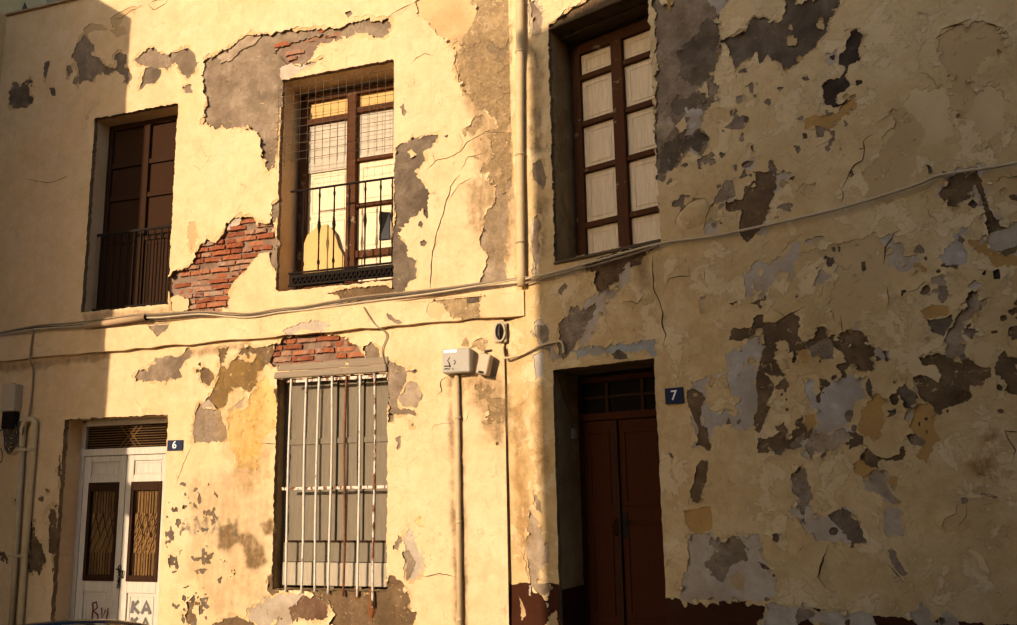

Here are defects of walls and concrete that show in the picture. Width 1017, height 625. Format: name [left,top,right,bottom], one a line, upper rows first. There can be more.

flaking render [149,198,282,336]
flaking render [67,6,394,177]
flaking render [328,131,448,303]
crack [430,181,455,285]
flaking render [415,0,513,321]
flaking render [529,159,548,193]
flaking render [527,0,615,36]
flaking render [650,0,867,243]
flaking render [132,320,423,471]
flaking render [672,163,1017,625]
peeling [165,482,218,573]
flaking render [172,516,426,625]